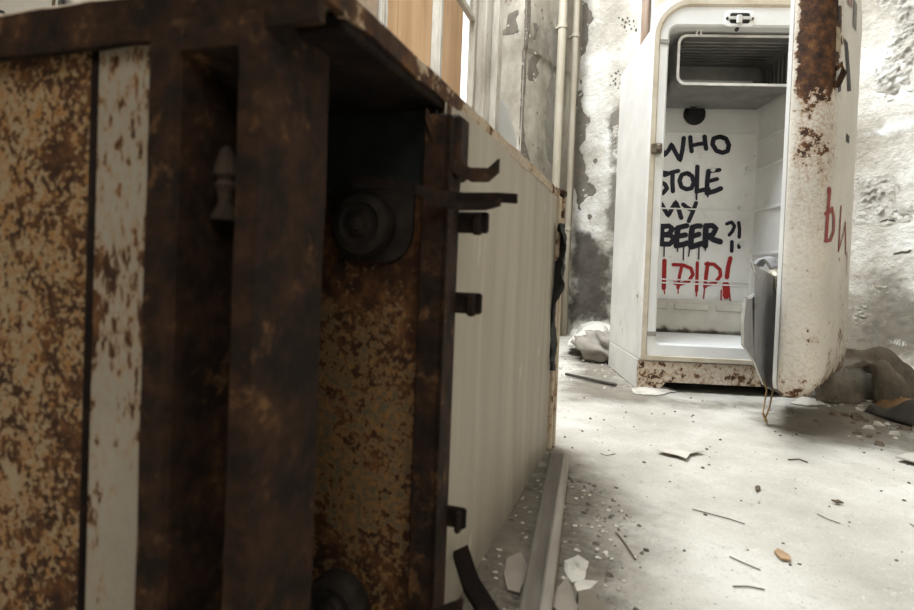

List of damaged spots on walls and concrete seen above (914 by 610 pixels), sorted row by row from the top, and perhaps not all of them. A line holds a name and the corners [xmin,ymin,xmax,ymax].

water stain [568,230,613,323]